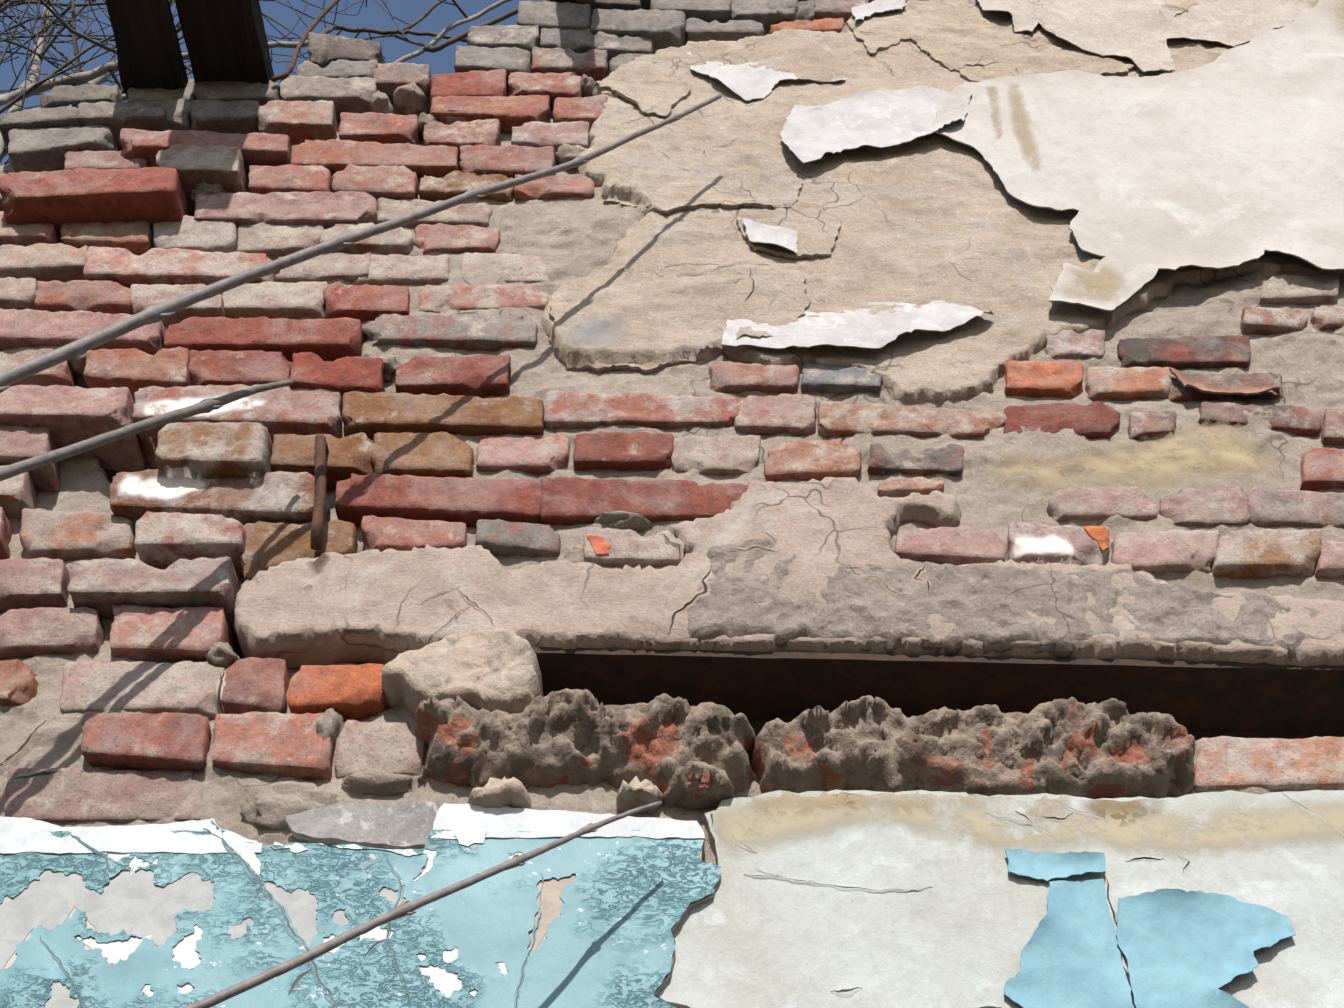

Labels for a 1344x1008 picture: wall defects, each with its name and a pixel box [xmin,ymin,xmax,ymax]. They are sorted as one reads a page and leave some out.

peeling [851,0,906,21]
peeling [977,0,1312,72]
peeling [686,51,846,101]
peeling [780,86,972,164]
water stain [1012,93,1033,154]
peeling [742,218,798,255]
crack [661,532,782,635]
peeling [0,853,215,994]
peeling [203,825,437,953]
crack [705,812,931,894]
crack [985,799,1109,843]
peeling [1004,848,1296,1008]